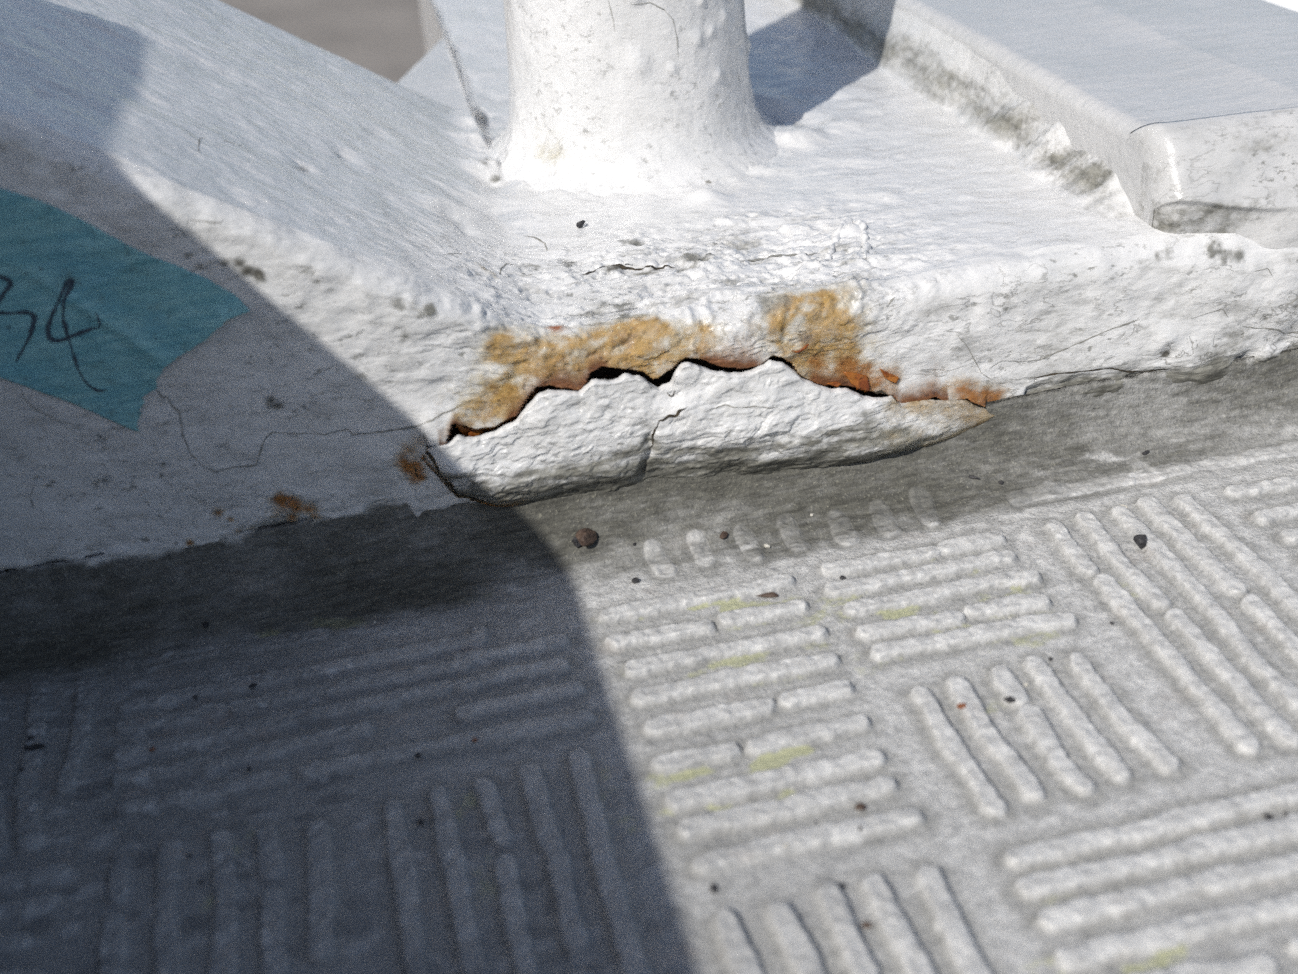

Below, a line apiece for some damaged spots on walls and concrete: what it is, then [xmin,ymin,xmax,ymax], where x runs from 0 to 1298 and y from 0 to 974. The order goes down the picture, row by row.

rust [273,492,316,520]
rust [398,447,509,507]
crack [156,344,899,504]
rust [439,316,762,446]
rust [767,290,1004,437]
crack [931,320,1167,408]